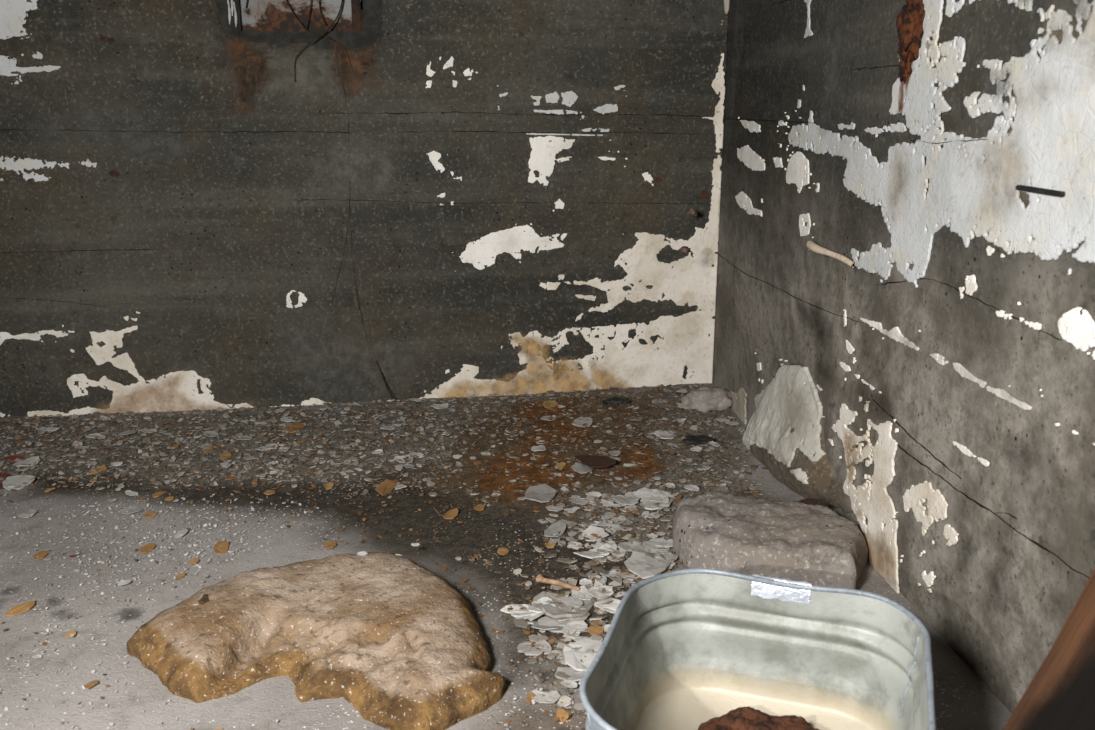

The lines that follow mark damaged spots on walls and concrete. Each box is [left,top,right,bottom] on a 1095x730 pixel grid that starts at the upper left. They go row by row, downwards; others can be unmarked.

peeling [0,0,38,40]
peeling [0,51,61,84]
rust [898,52,913,112]
peeling [737,0,1095,288]
peeling [0,325,75,345]
peeling [372,53,959,593]
crack [716,253,859,322]
peeling [959,275,978,299]
peeling [996,302,1042,330]
peeling [27,311,268,444]
peeling [269,398,360,422]
crack [872,399,1089,578]